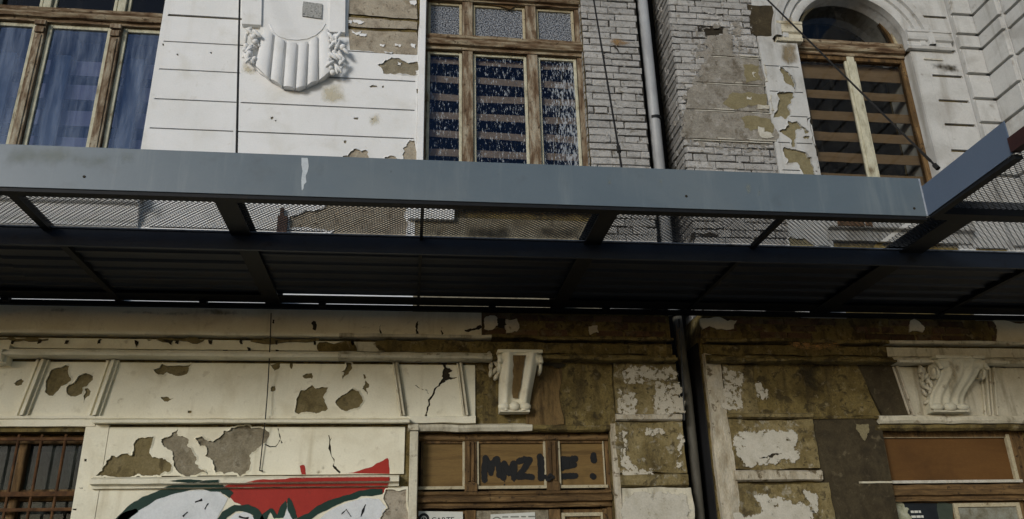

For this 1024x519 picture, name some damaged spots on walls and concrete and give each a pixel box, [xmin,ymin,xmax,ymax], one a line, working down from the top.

flaking render [348,0,419,93]
spalling [704,28,723,36]
flaking render [723,41,821,175]
flaking render [785,220,834,247]
flaking render [43,363,95,399]
flaking render [152,362,192,378]
flaking render [239,321,369,416]
crack [415,363,457,416]
peeling [617,389,638,415]
peeling [652,381,686,414]
flaking render [96,424,271,477]
crack [328,435,340,473]